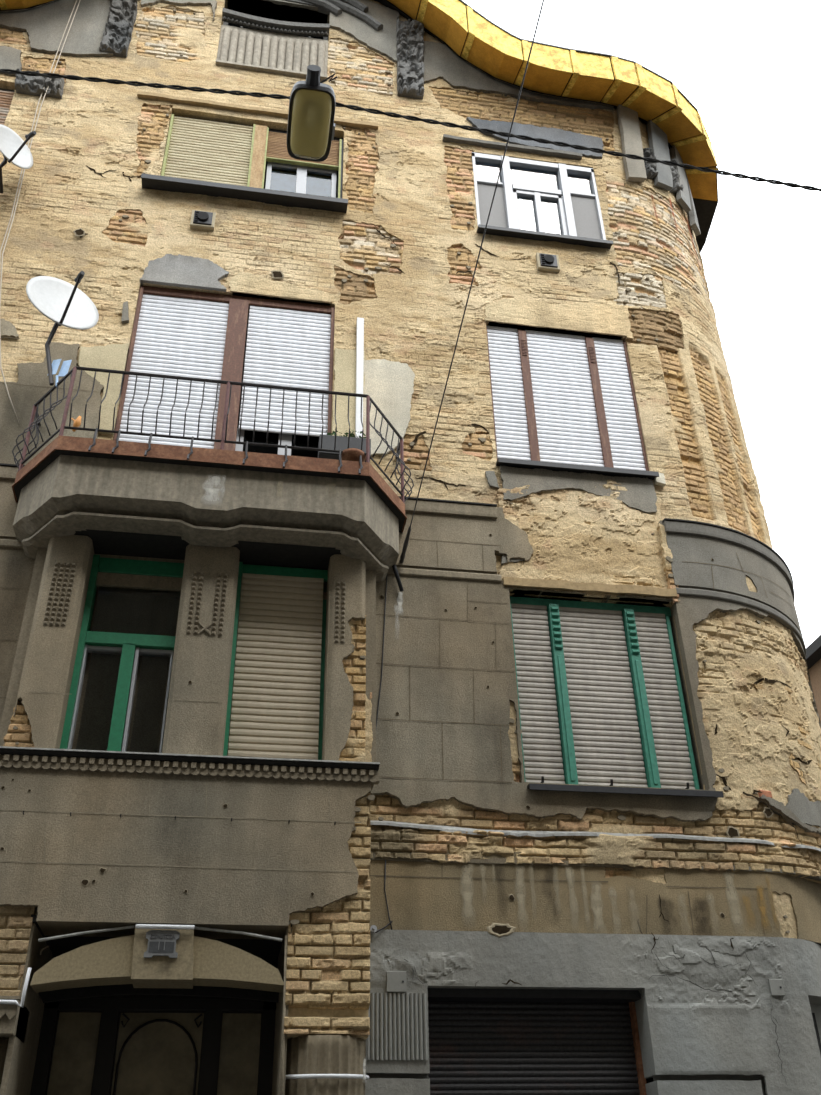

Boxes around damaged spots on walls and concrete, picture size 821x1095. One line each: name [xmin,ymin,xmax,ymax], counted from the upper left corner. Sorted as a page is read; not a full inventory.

flaking render [102,209,152,247]
flaking render [334,126,404,304]
flaking render [603,171,711,353]
flaking render [496,480,680,605]
flaking render [284,609,821,1035]
damp [461,866,483,917]
damp [516,868,525,920]
damp [566,869,619,929]
damp [726,875,767,925]
flaking render [0,906,35,996]